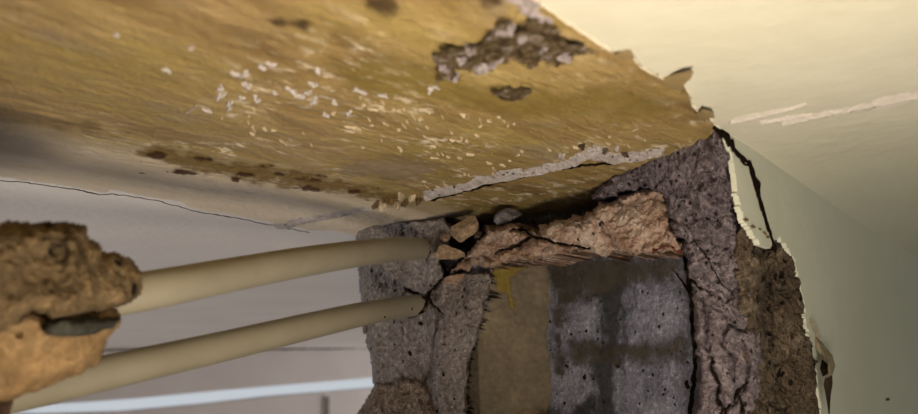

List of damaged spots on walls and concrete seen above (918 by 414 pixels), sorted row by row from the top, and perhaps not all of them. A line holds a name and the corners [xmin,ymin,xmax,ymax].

water stain [184,61,277,114]
water stain [272,67,338,118]
peeling [344,97,515,160]
crack [430,176,530,201]
spalling [432,0,721,129]
crack [562,162,612,170]
crack [712,91,918,254]
crack [408,223,591,318]
crack [652,240,773,414]
peeling [809,319,835,414]